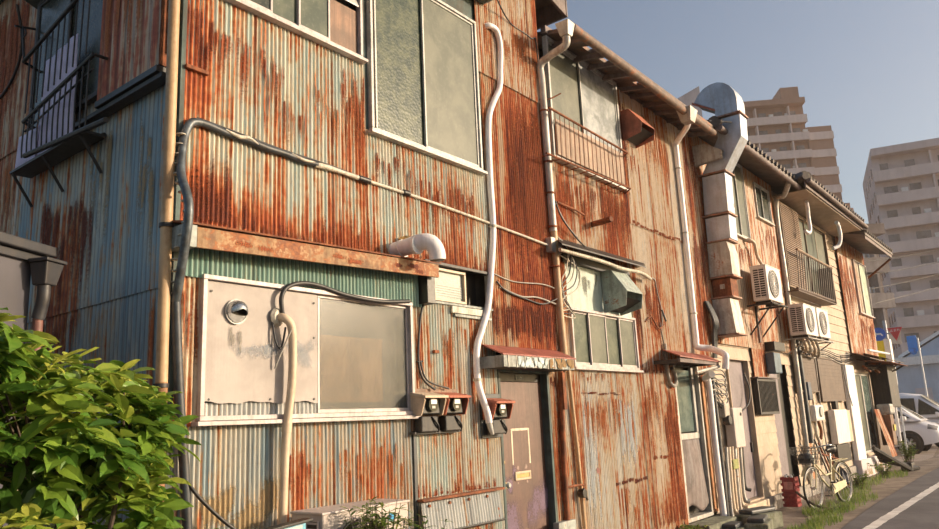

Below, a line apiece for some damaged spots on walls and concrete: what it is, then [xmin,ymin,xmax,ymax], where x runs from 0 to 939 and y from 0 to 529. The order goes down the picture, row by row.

rust [189,4,306,142]
rust [316,69,365,158]
rust [41,197,93,299]
rust [183,154,428,274]
rust [376,153,475,228]
rust [506,103,709,306]
rust [464,324,479,356]
rust [493,300,557,343]
rust [635,283,662,350]
rust [340,446,405,502]
rust [570,372,625,487]
rust [616,364,687,529]